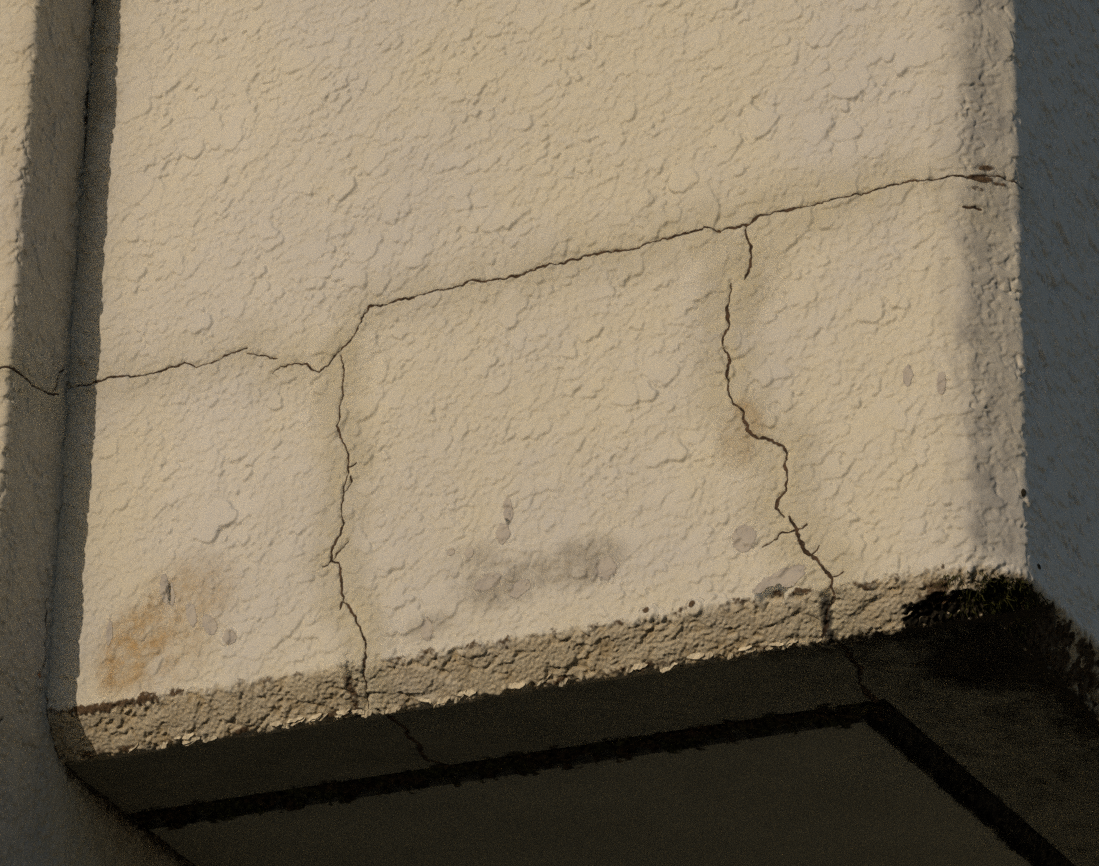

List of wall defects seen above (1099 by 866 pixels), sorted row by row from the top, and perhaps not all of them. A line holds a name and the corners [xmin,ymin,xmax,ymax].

crack [84,64,92,157]
corrosion [105,610,169,687]
crack [0,174,1023,765]
damp [698,173,1099,750]